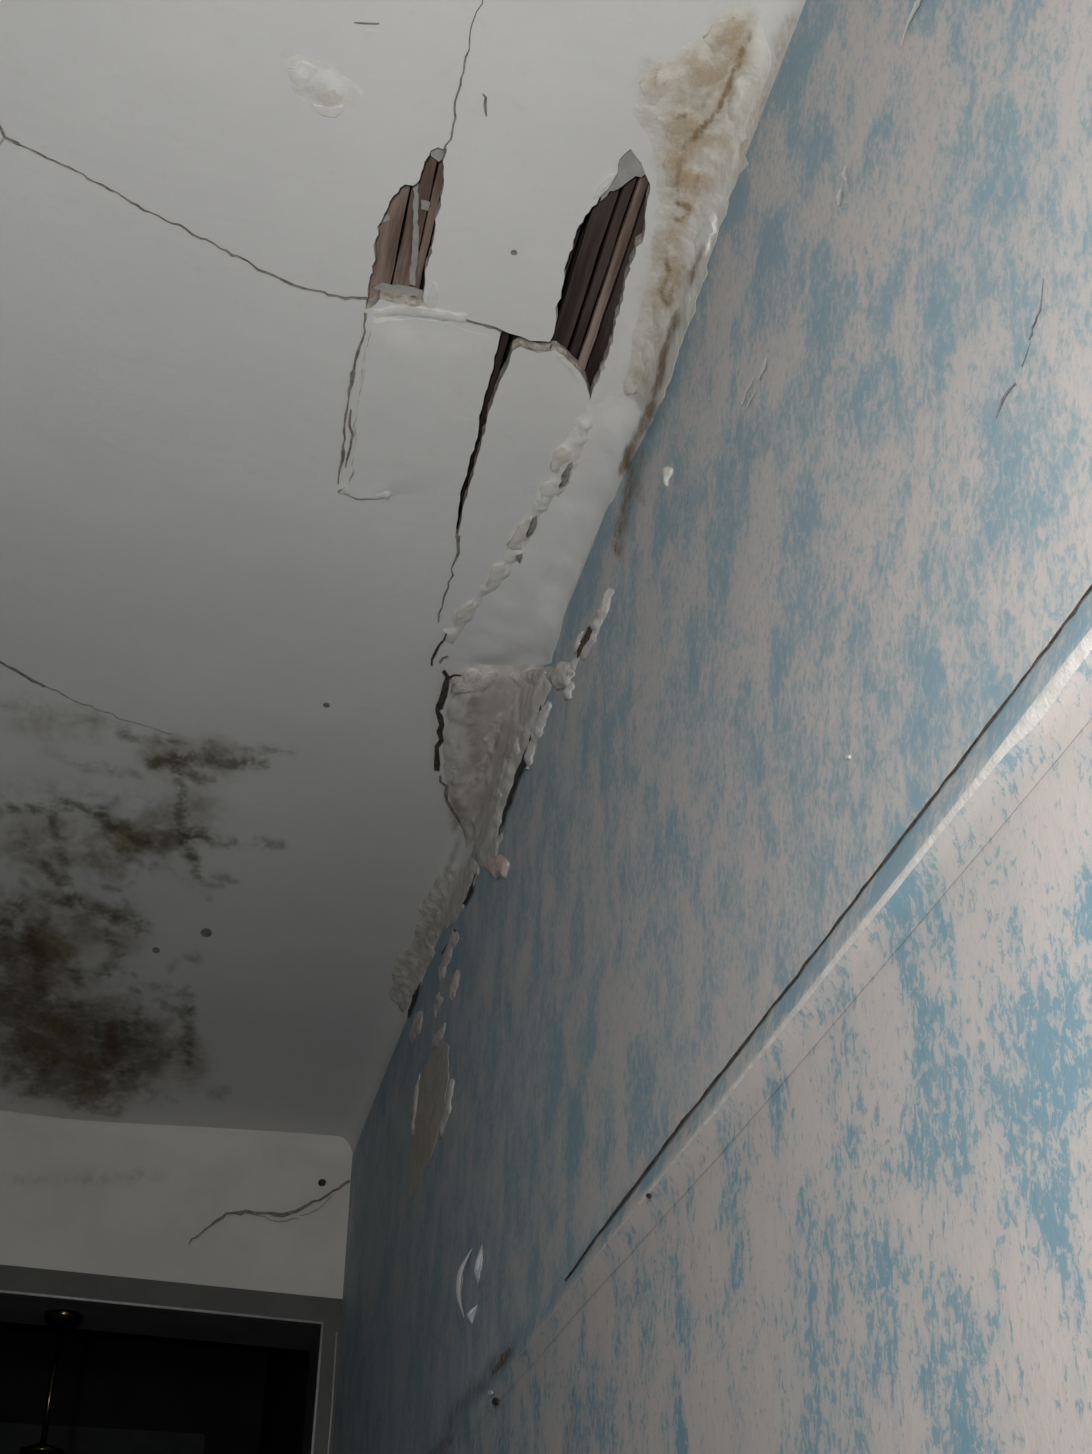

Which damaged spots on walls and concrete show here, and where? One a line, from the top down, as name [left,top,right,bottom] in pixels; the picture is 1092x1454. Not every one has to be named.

crack [443,0,487,152]
damp [667,24,744,241]
crack [0,125,367,484]
spalling [366,147,467,323]
peeling [442,7,771,644]
crack [431,319,552,835]
crack [0,661,171,735]
crack [407,982,421,1018]
crack [441,875,475,954]
spalling [389,661,575,1044]
crack [189,1180,350,1244]